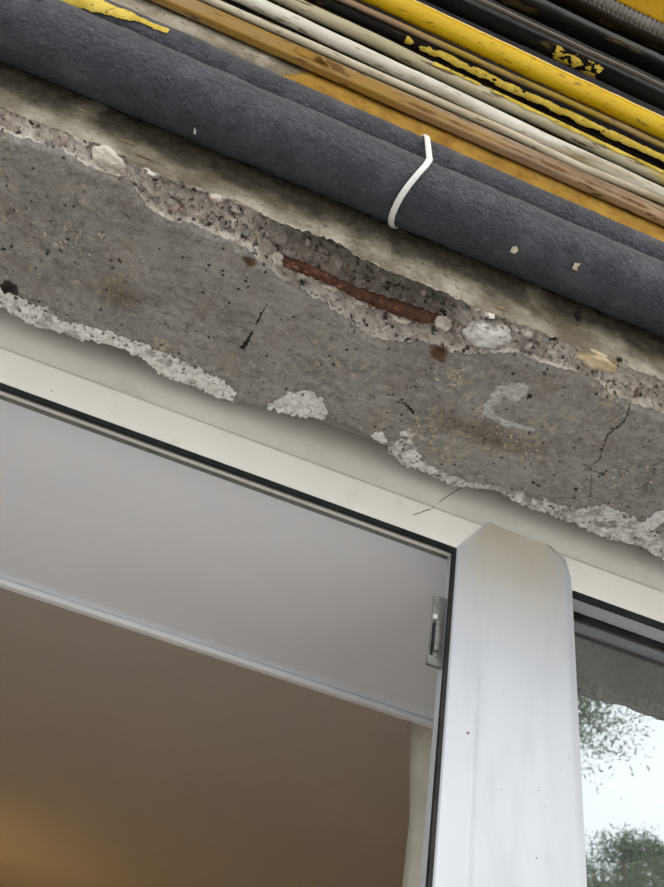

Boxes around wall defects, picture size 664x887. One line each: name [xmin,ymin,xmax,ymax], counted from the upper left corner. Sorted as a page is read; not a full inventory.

spalling [0,108,664,414]
peeling [267,390,329,420]
crack [412,487,462,516]
peeling [479,372,552,466]
peeling [371,401,664,560]
crack [584,403,630,501]